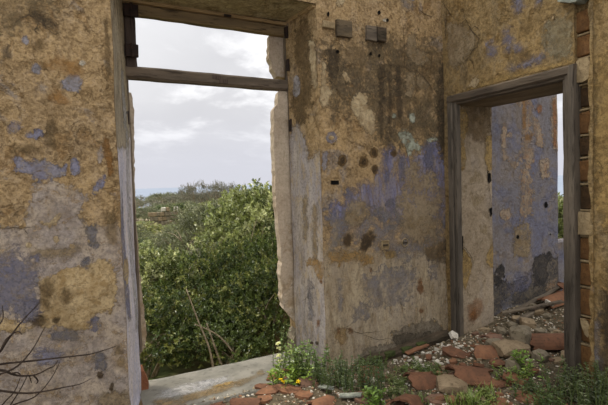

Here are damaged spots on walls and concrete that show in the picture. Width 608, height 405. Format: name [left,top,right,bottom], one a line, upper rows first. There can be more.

peeling [0,0,141,405]
water stain [291,19,446,262]
peeling [289,121,448,370]
flaking render [486,96,559,316]